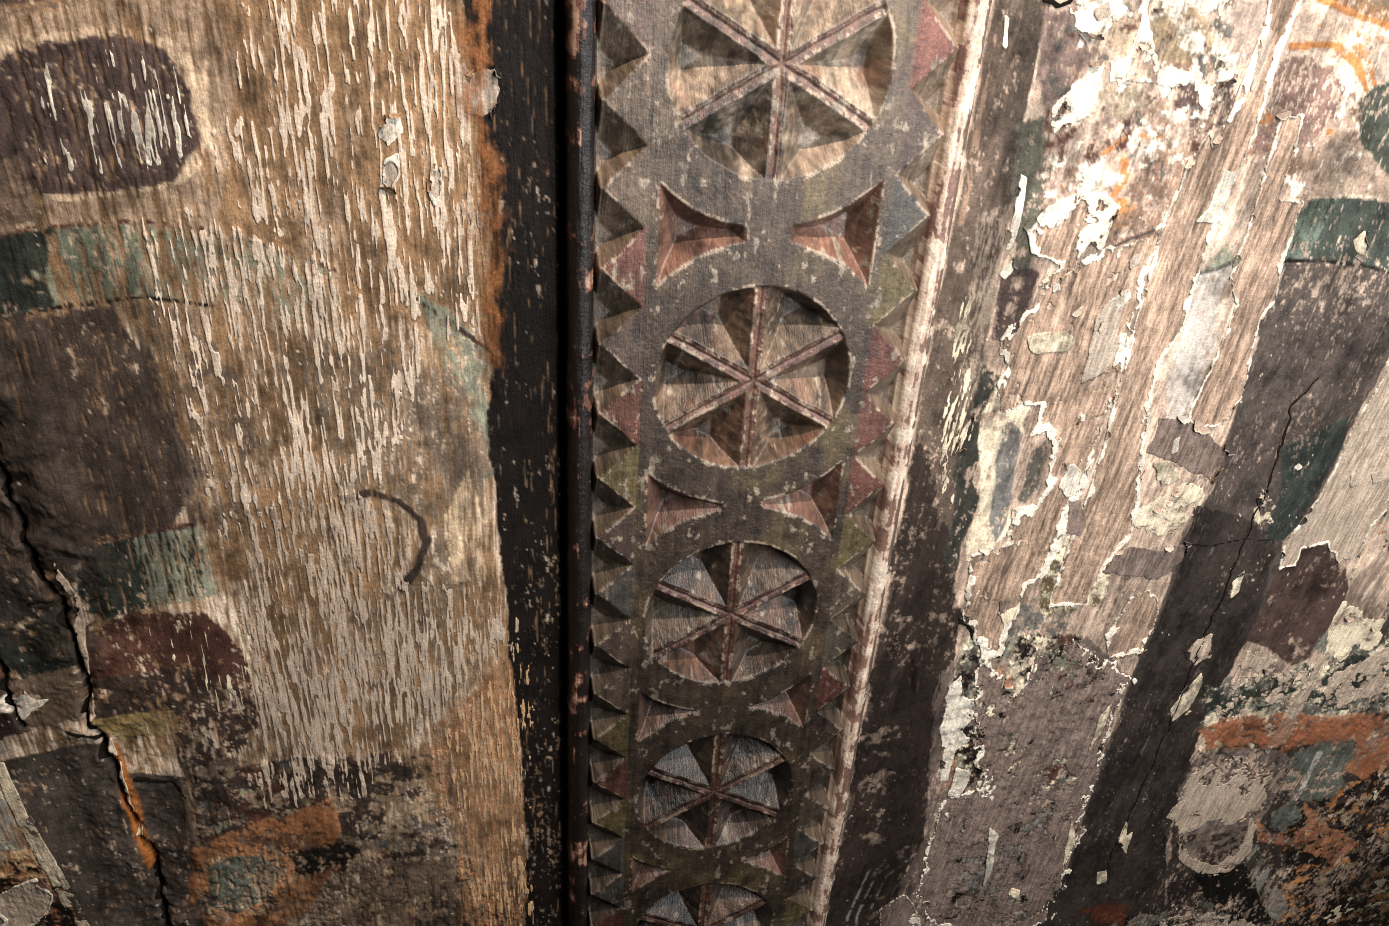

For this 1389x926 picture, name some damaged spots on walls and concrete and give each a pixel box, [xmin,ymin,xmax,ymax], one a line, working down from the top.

peeling [1353,231,1370,262]
peeling [879,0,1305,926]
peeling [1278,367,1389,570]
crack [0,475,186,926]
crack [1106,377,1319,872]
peeling [1166,601,1389,876]
peeling [1324,877,1388,925]